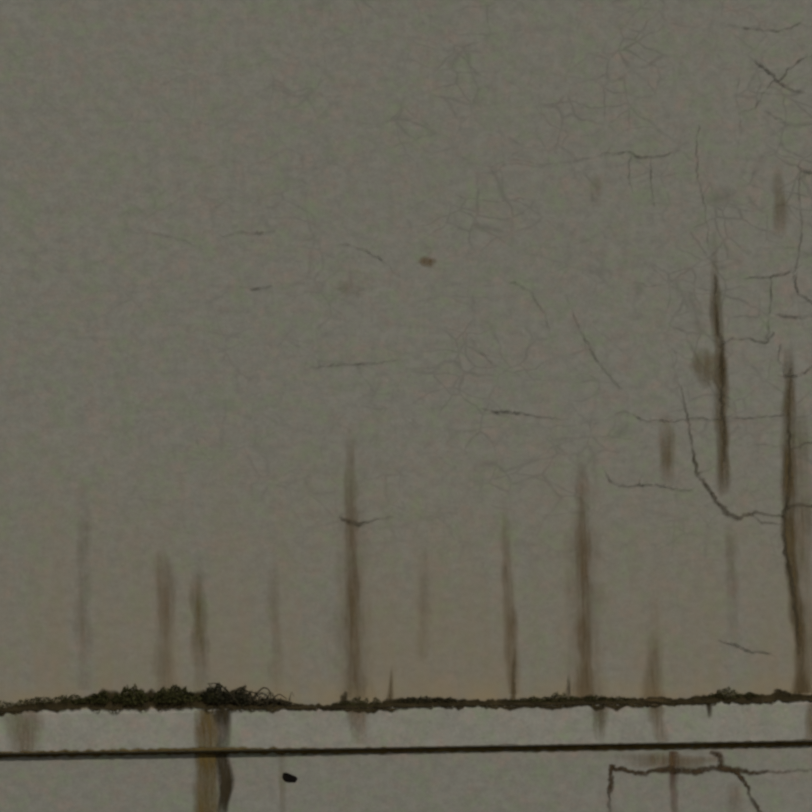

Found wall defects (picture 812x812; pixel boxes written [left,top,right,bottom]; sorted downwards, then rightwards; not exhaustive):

leakage [713,297,728,481]
crack [719,358,727,424]
crack [693,455,750,519]
crack [783,431,799,629]
leakage [208,694,230,729]
crack [0,685,812,716]
leakage [216,753,232,812]
crack [608,751,768,812]